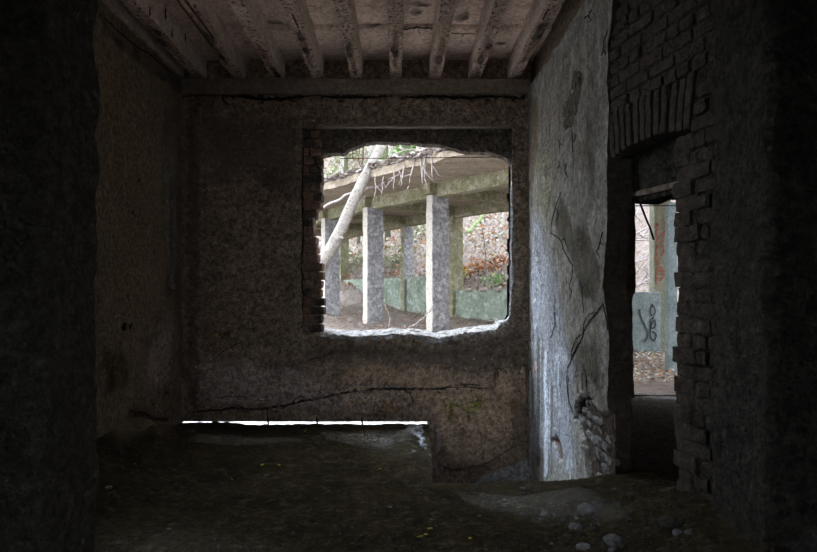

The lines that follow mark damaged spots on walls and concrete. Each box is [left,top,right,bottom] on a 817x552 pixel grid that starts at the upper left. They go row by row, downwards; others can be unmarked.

flaking render [303,121,510,345]
crack [550,131,608,414]
crack [181,367,498,422]
flaking render [554,363,620,476]